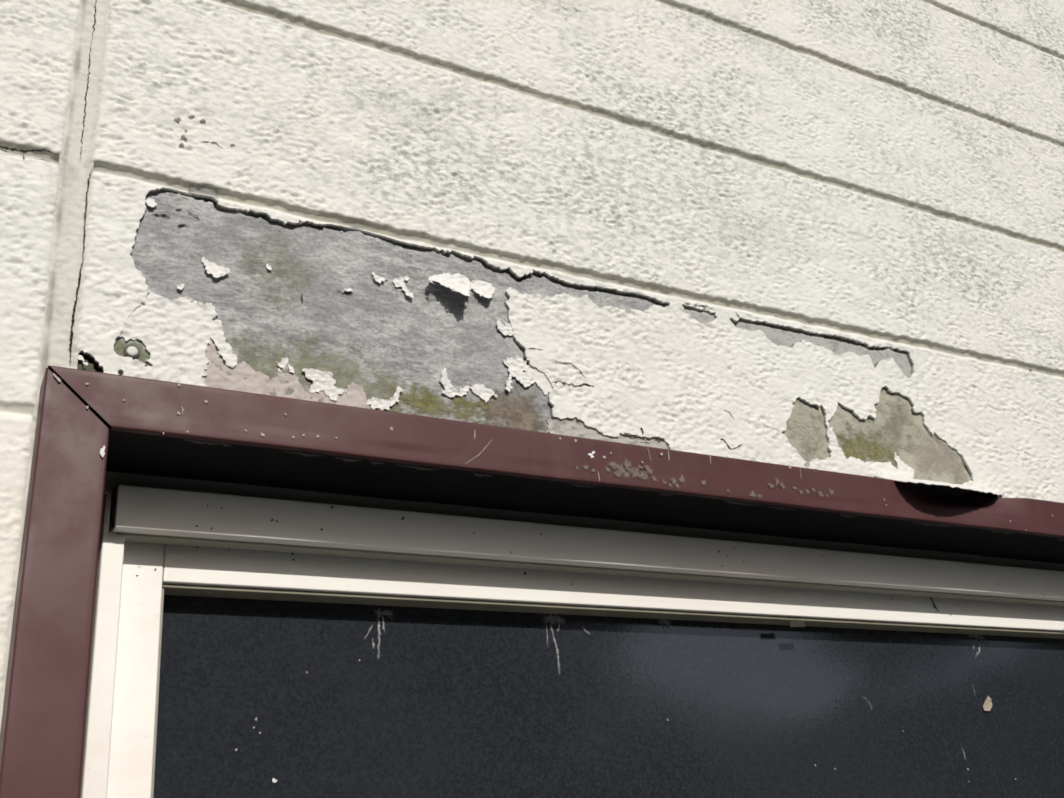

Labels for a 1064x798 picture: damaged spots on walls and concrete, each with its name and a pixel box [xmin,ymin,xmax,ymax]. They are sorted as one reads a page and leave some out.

crack [0,0,97,361]
spalling [77,352,103,373]
peeling [114,184,669,449]
peeling [682,305,716,324]
peeling [730,319,912,378]
peeling [782,387,972,496]